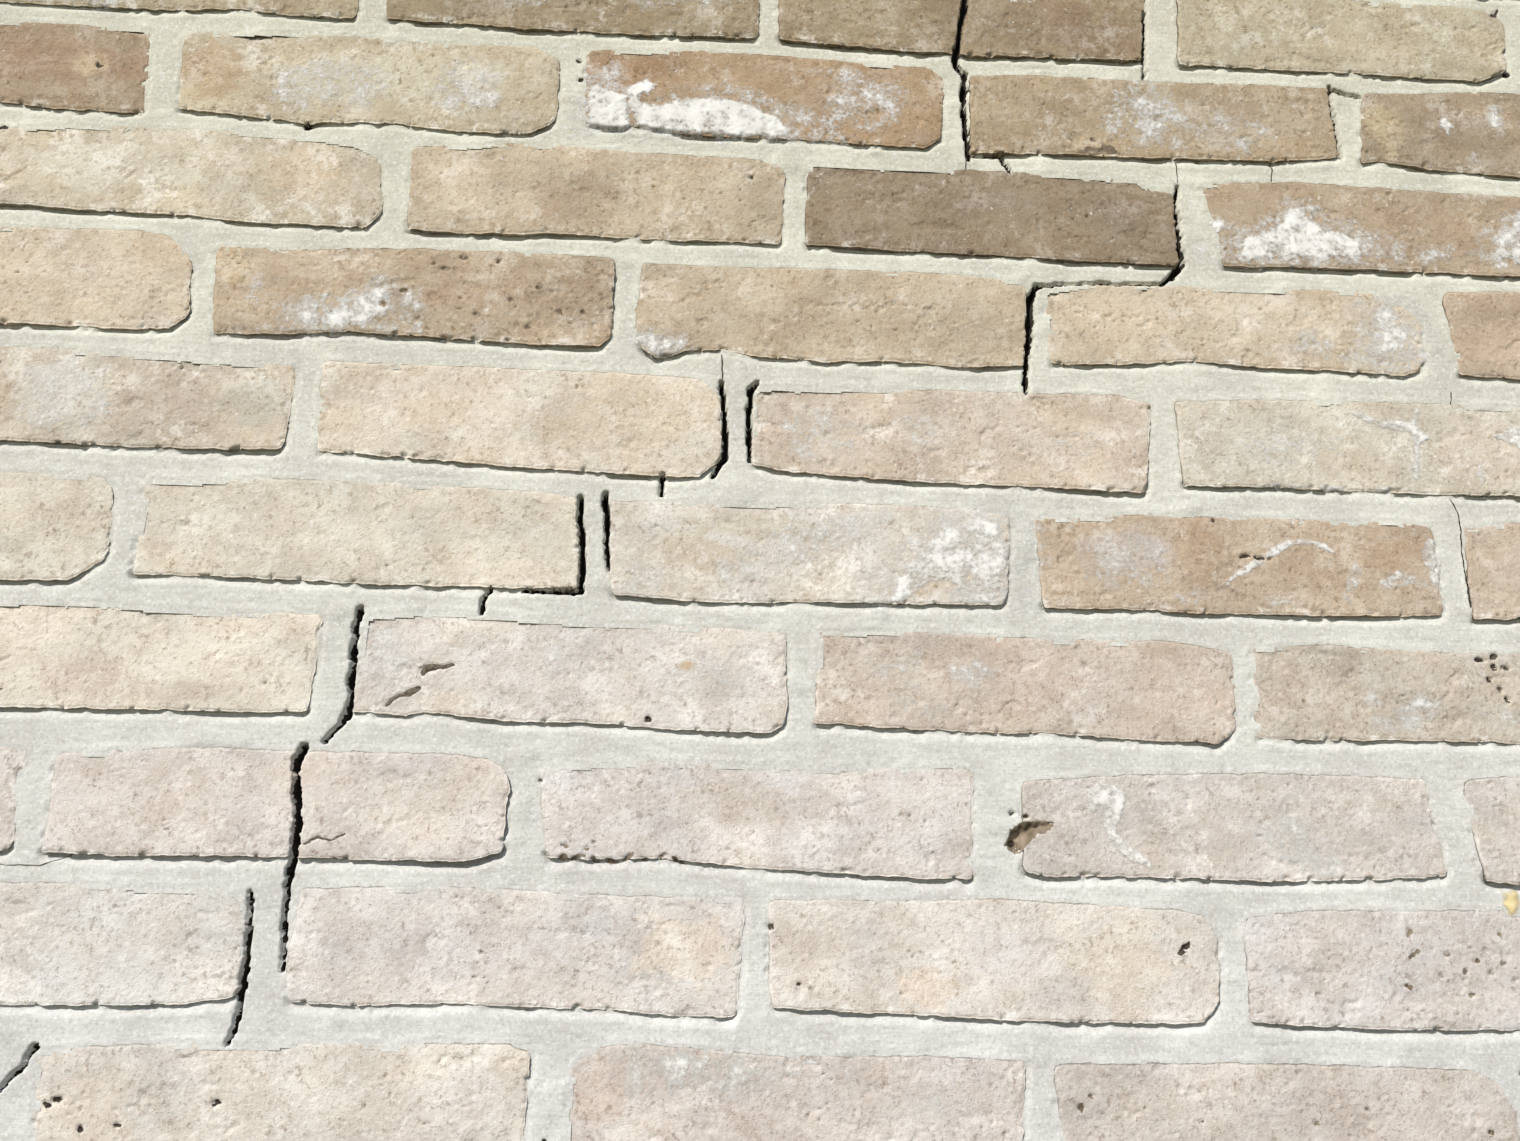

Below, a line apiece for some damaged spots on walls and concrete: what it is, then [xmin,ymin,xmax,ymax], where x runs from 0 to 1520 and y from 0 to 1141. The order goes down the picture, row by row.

crack [951,0,1010,173]
crack [1139,19,1147,80]
crack [1021,163,1185,395]
crack [711,354,758,479]
crack [659,477,667,497]
crack [480,496,611,615]
crack [1,853,73,866]
crack [226,610,455,1043]
crack [2,1045,40,1089]